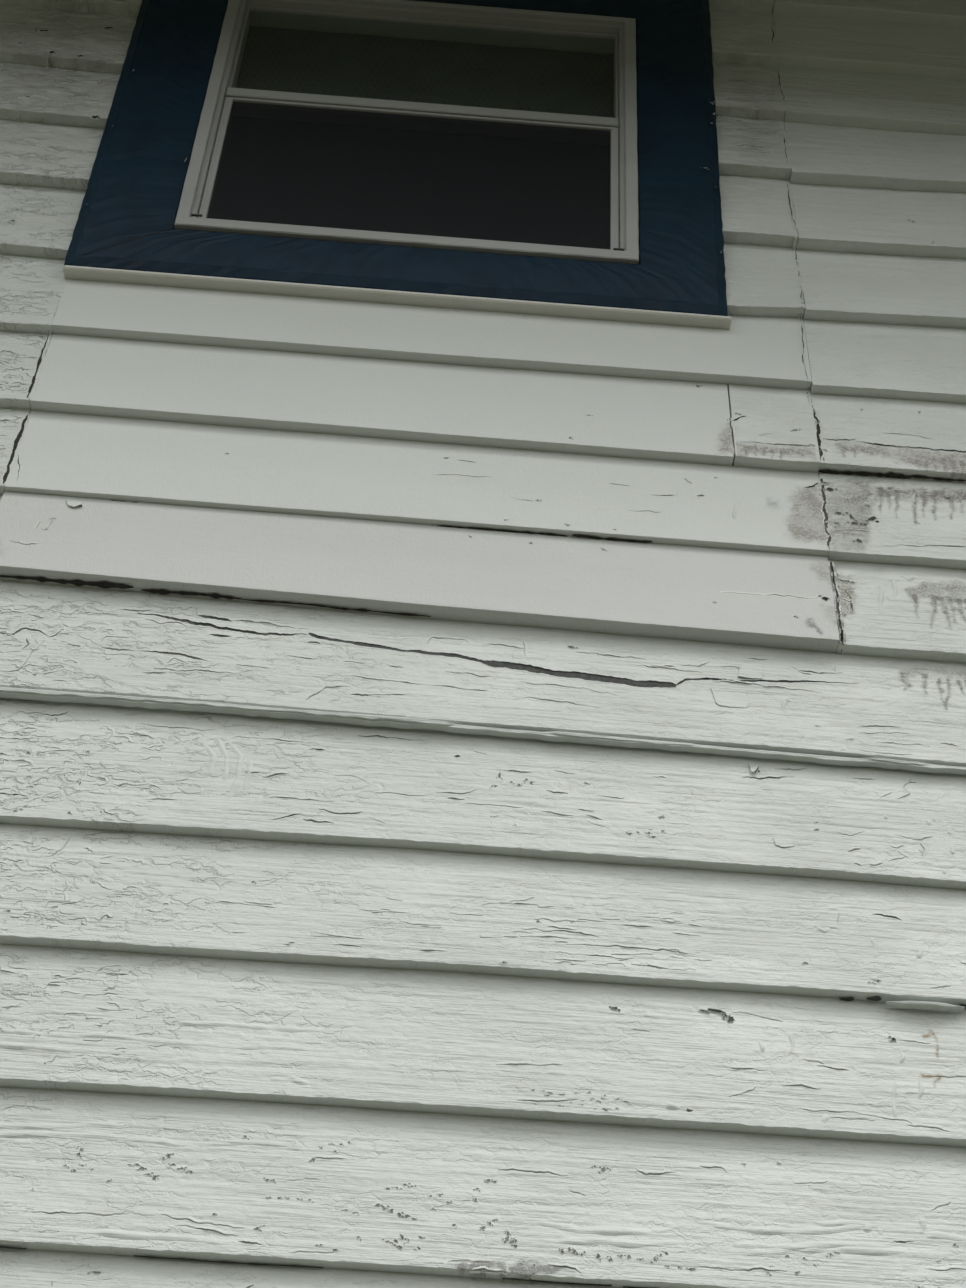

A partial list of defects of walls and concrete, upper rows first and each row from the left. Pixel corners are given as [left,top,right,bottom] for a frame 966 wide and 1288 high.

crack [0,21,966,829]
leakage [789,483,966,540]
leakage [912,585,966,618]
peeling [738,663,763,679]
crack [284,895,712,972]
crack [0,963,176,1066]
spalling [699,1008,735,1023]
crack [496,1061,584,1104]
crack [728,1055,949,1133]
spalling [127,1152,194,1181]
spalling [374,1182,453,1251]
peeling [443,1218,697,1280]